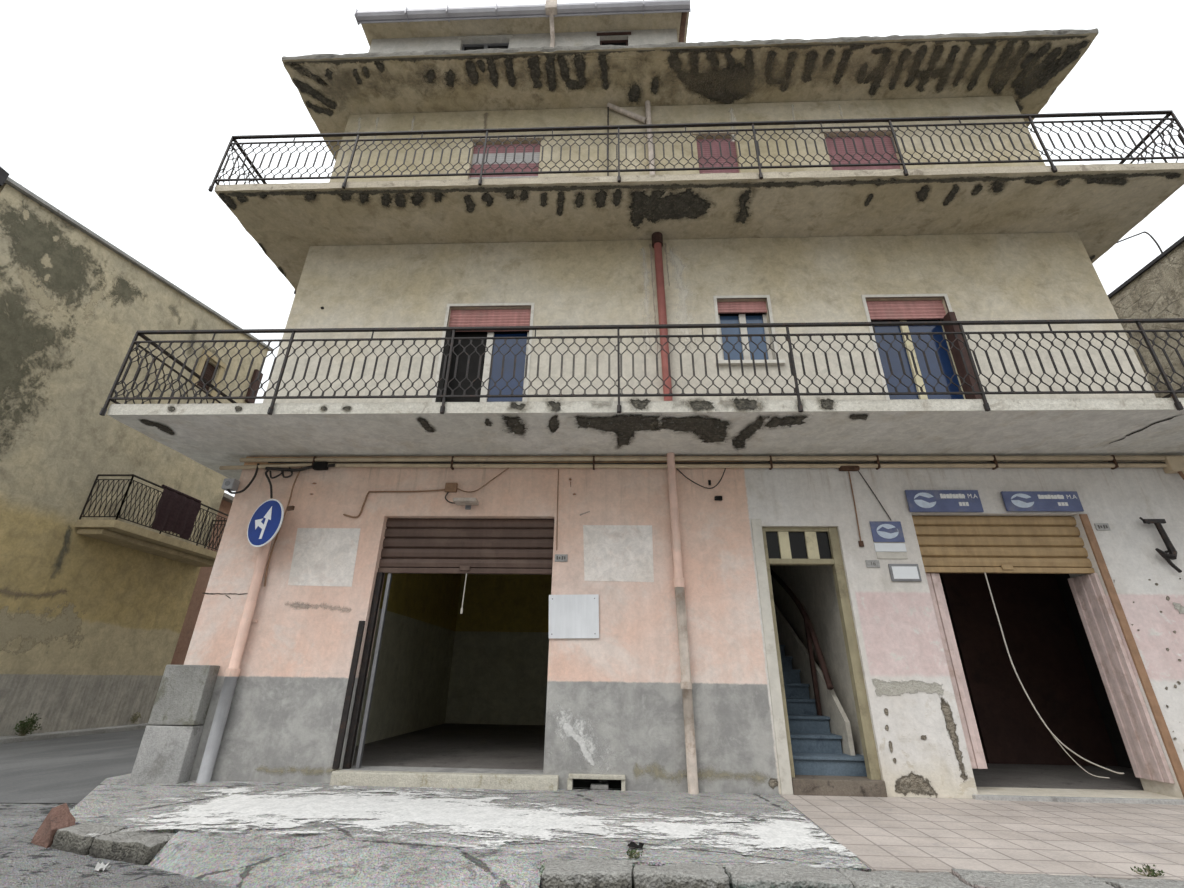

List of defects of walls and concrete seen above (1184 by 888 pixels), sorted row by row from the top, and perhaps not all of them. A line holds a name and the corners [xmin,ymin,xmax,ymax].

spalling [284,36,1088,116]
peeling [219,172,1181,229]
water stain [0,199,145,453]
spalling [417,417,435,433]
spalling [485,401,527,435]
spalling [547,400,561,433]
spalling [575,396,808,449]
spalling [818,398,836,410]
water stain [553,705,609,771]
peeling [872,678,968,782]
flaking render [895,771,938,798]